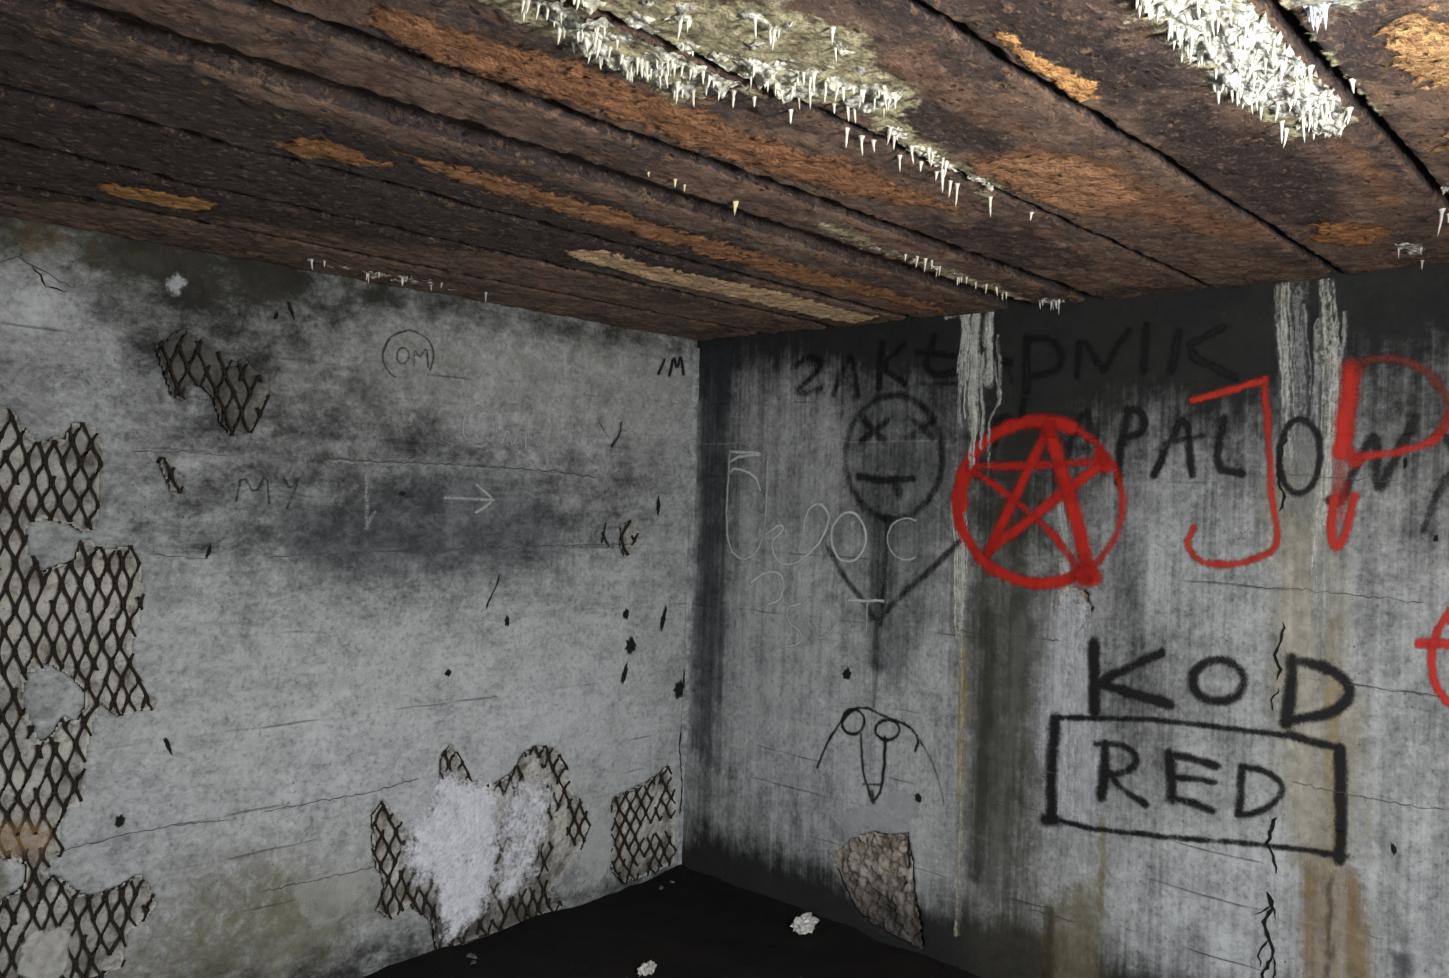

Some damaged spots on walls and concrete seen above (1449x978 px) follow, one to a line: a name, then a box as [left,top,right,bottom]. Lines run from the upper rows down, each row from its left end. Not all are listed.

water stain [479,0,1017,217]
water stain [1123,0,1380,148]
water stain [307,258,457,291]
spalling [155,327,271,436]
water stain [1274,278,1347,840]
spalling [0,406,157,978]
water stain [402,772,554,942]
spalling [371,745,591,950]
spalling [611,765,677,885]
spalling [834,831,924,949]
crack [1255,817,1278,978]
crack [1294,782,1448,810]